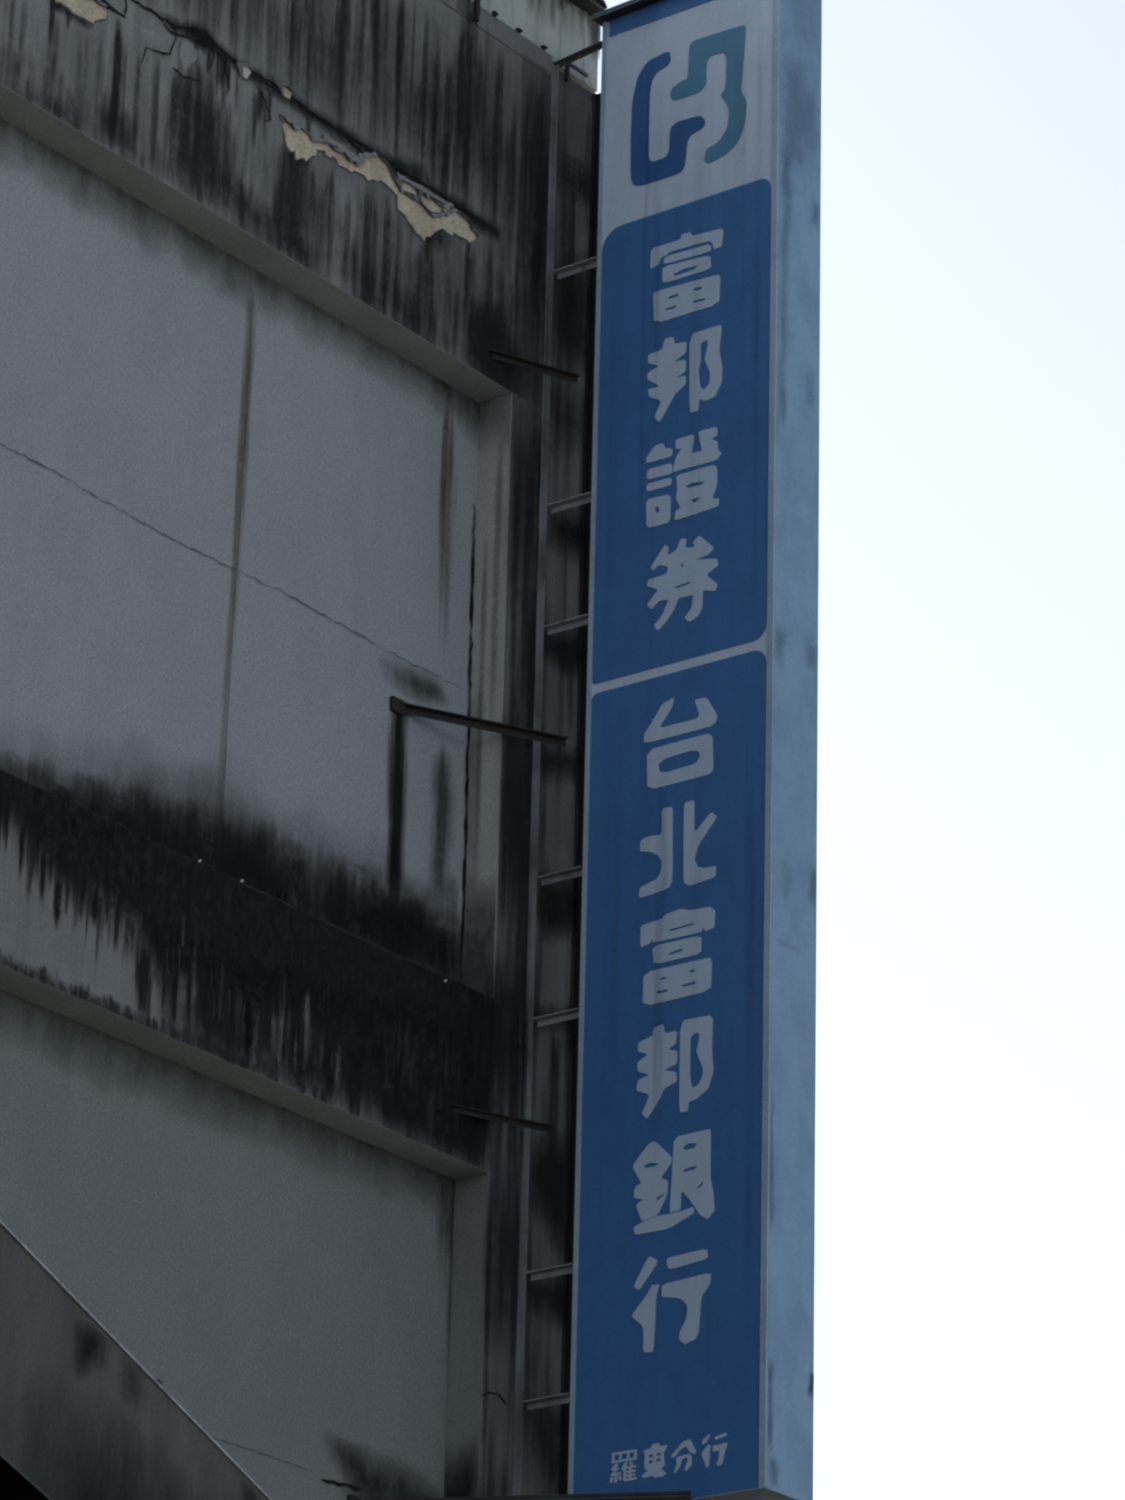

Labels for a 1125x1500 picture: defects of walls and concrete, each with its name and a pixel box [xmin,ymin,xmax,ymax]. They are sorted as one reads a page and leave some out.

leakage [50,0,87,38]
peeling [54,0,109,25]
leakage [104,31,140,139]
peeling [237,62,251,80]
crack [102,0,497,231]
leakage [167,0,544,306]
peeling [276,83,479,244]
leakage [362,204,443,335]
crack [0,300,476,979]
leakage [503,452,581,934]
leakage [0,714,575,1242]
crack [211,1436,363,1492]